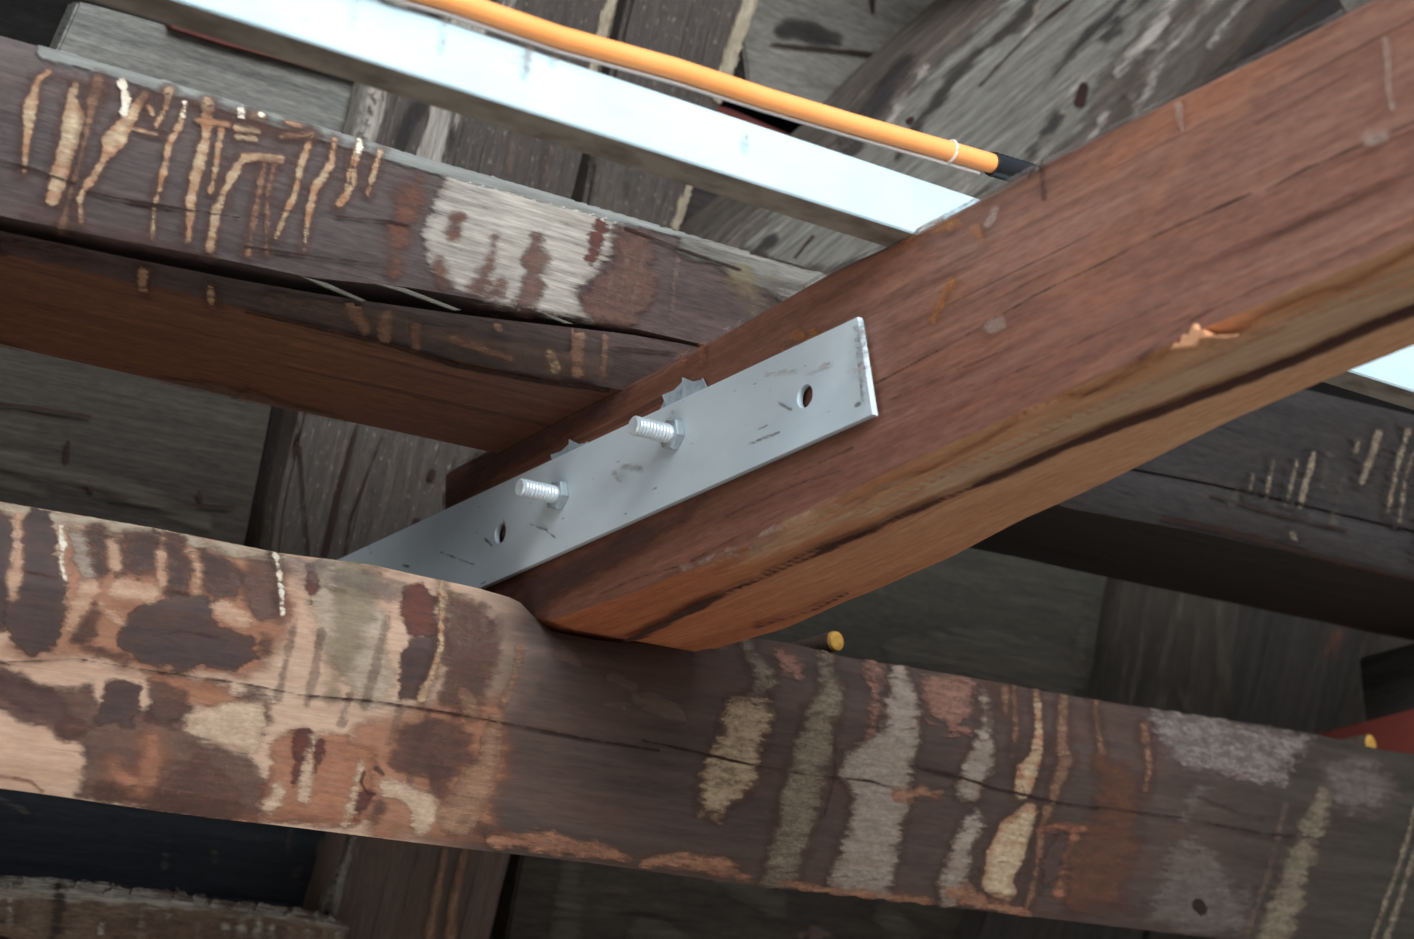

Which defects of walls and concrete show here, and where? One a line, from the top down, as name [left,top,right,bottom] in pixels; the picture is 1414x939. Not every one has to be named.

crack [0,161,377,265]
crack [336,215,411,227]
crack [625,227,814,270]
crack [873,121,1414,385]
crack [617,304,1414,642]
crack [0,658,43,666]
crack [80,659,1319,839]